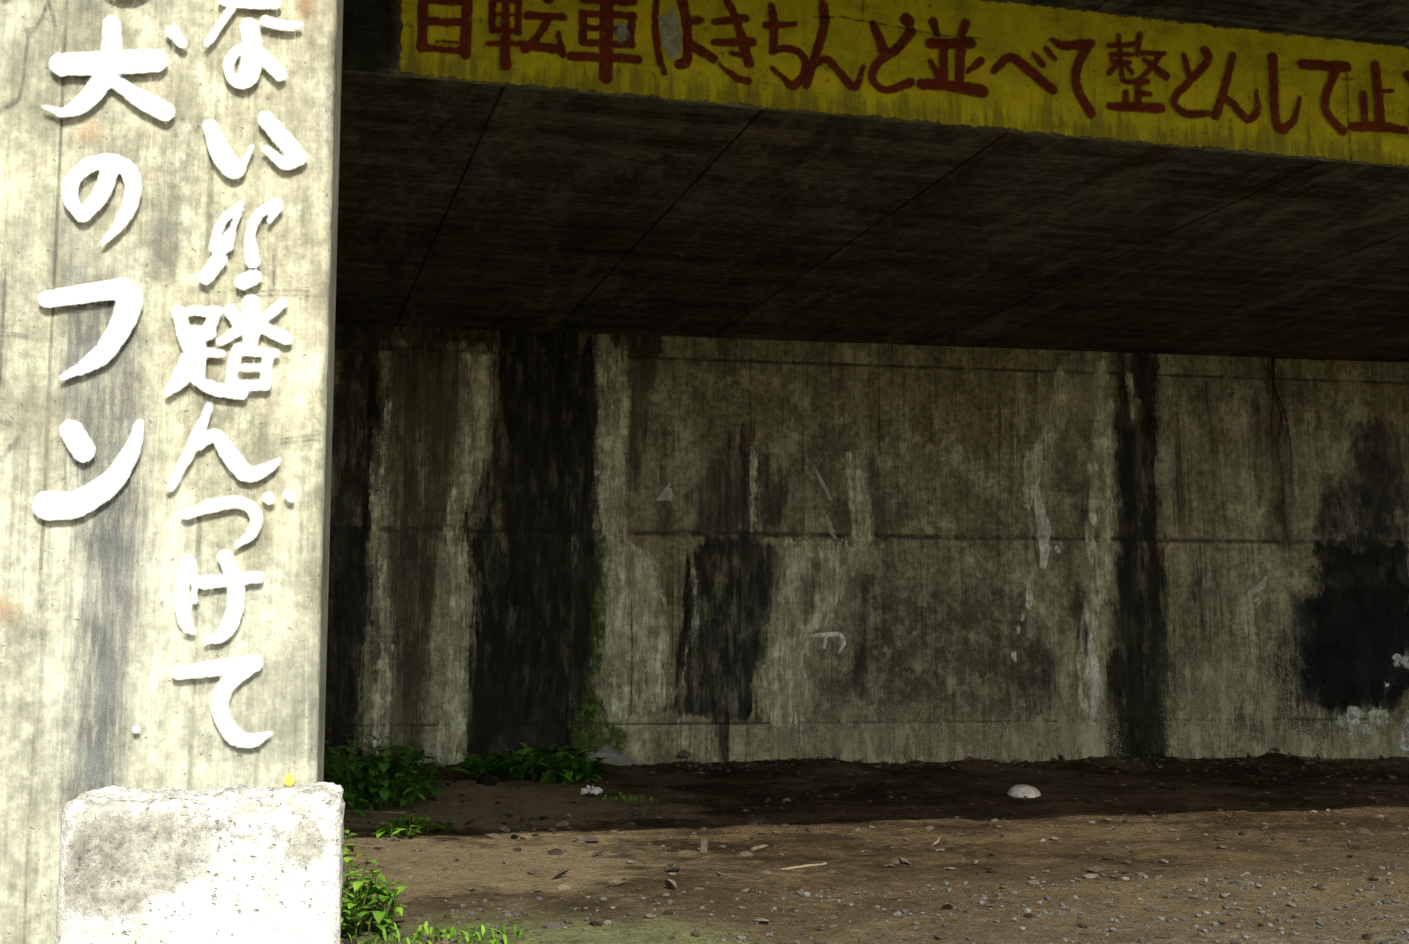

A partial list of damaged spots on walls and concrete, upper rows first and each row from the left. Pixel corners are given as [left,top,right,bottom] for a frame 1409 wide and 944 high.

peeling [657,10,682,59]
damp [324,324,1409,768]